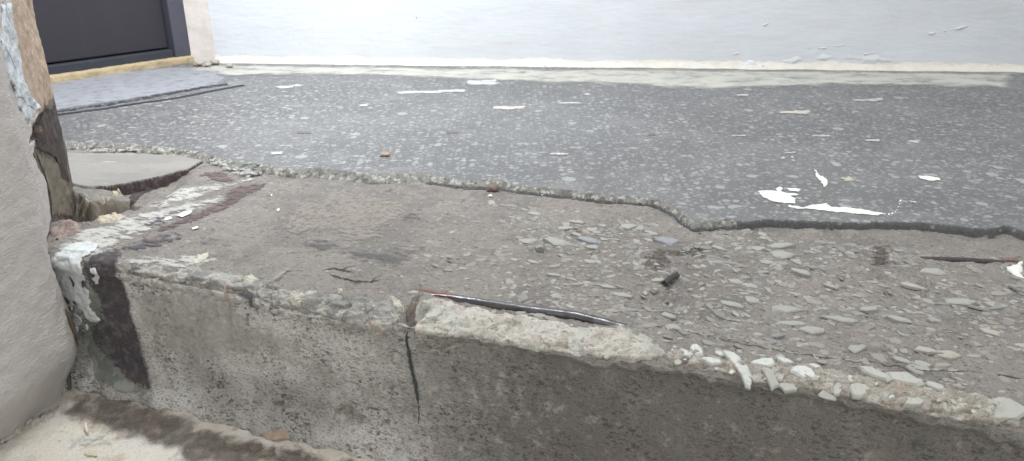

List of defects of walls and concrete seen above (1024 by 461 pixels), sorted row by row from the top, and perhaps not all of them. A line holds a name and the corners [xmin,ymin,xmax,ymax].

crack [405,332,420,423]
spalling [63,137,1024,428]